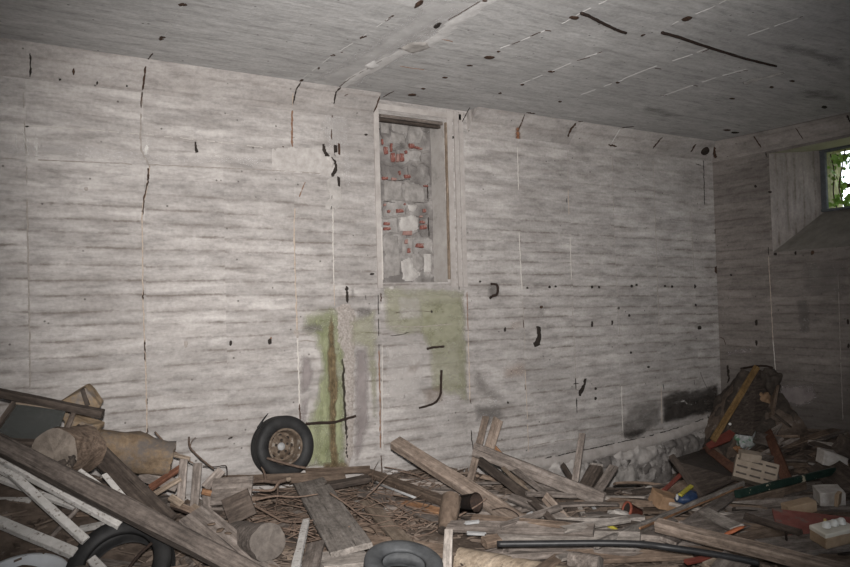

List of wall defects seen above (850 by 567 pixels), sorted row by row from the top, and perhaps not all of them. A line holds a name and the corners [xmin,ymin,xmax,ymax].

crack [501,0,607,48]
crack [331,48,424,155]
crack [2,3,321,433]
leakage [303,359,312,390]
rust [324,320,347,467]
leakage [356,351,367,454]
crack [331,206,471,471]
leakage [624,386,717,437]